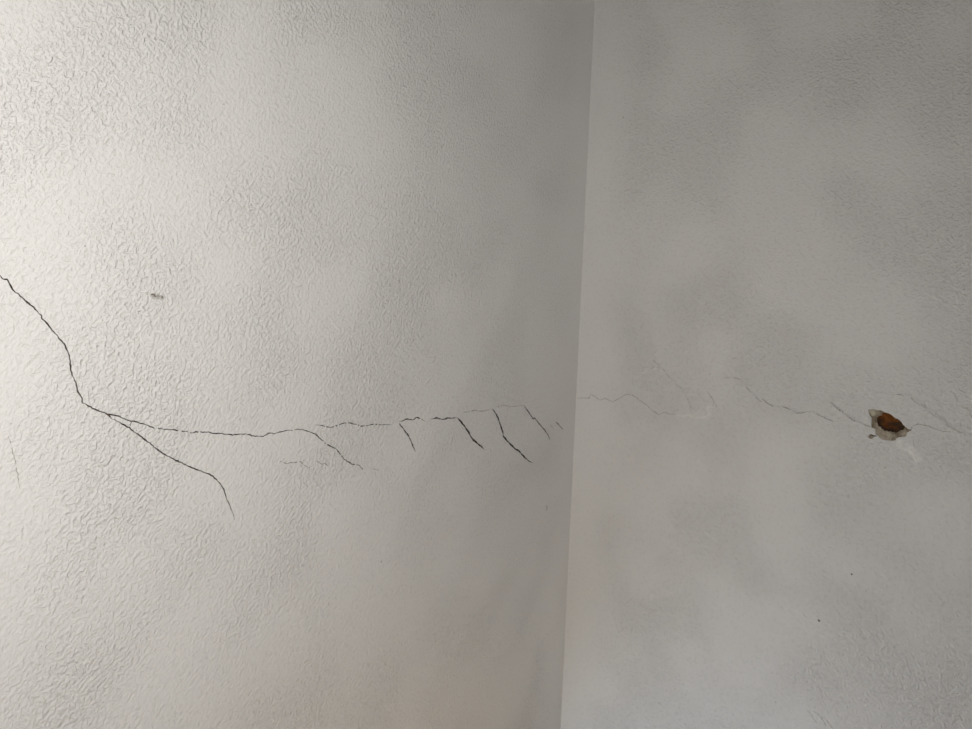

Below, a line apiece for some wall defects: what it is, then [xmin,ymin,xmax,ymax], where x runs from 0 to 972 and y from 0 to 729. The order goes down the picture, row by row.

crack [0,275,562,519]
spalling [868,409,912,441]